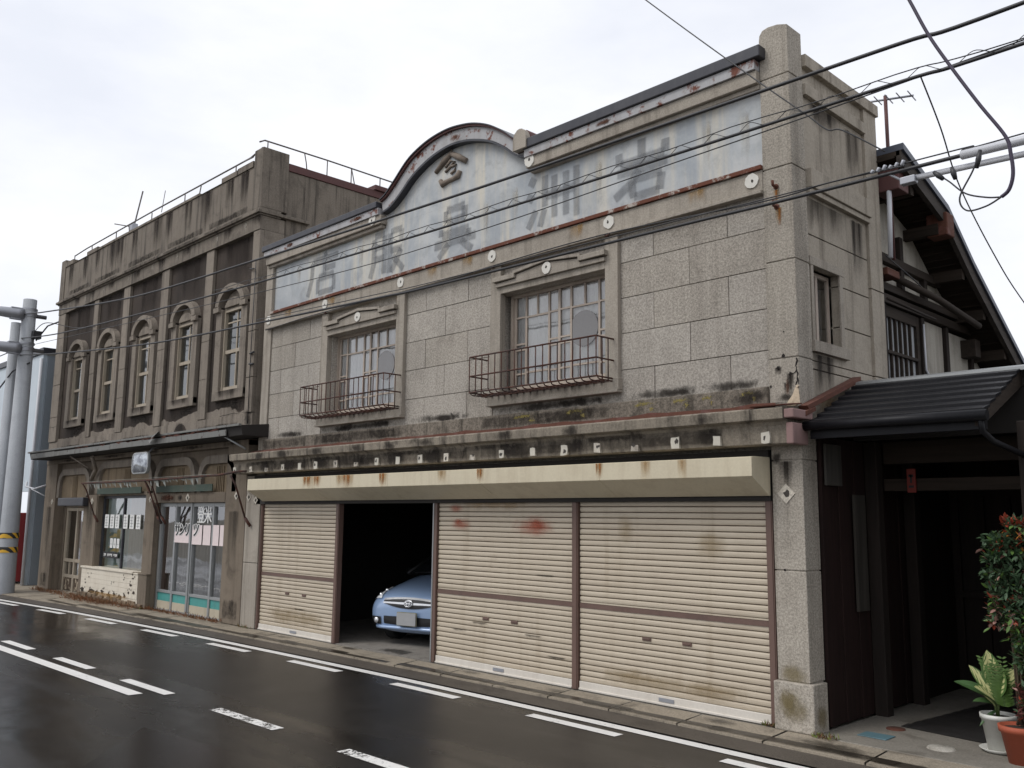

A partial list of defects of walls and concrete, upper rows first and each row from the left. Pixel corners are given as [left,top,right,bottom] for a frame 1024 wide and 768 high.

damp [643,389,688,397]
spalling [786,384,800,406]
damp [337,421,388,431]
damp [519,398,600,451]
damp [698,417,716,443]
peeling [80,574,135,598]